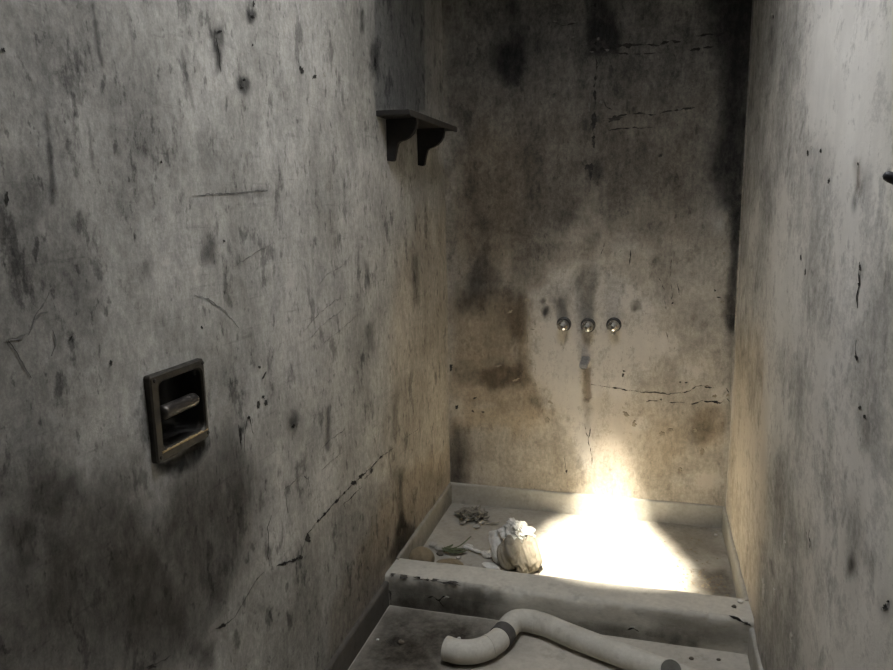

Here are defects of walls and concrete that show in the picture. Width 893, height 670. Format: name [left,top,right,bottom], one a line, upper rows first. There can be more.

crack [588,30,731,148]
crack [592,381,730,405]
crack [216,452,388,629]